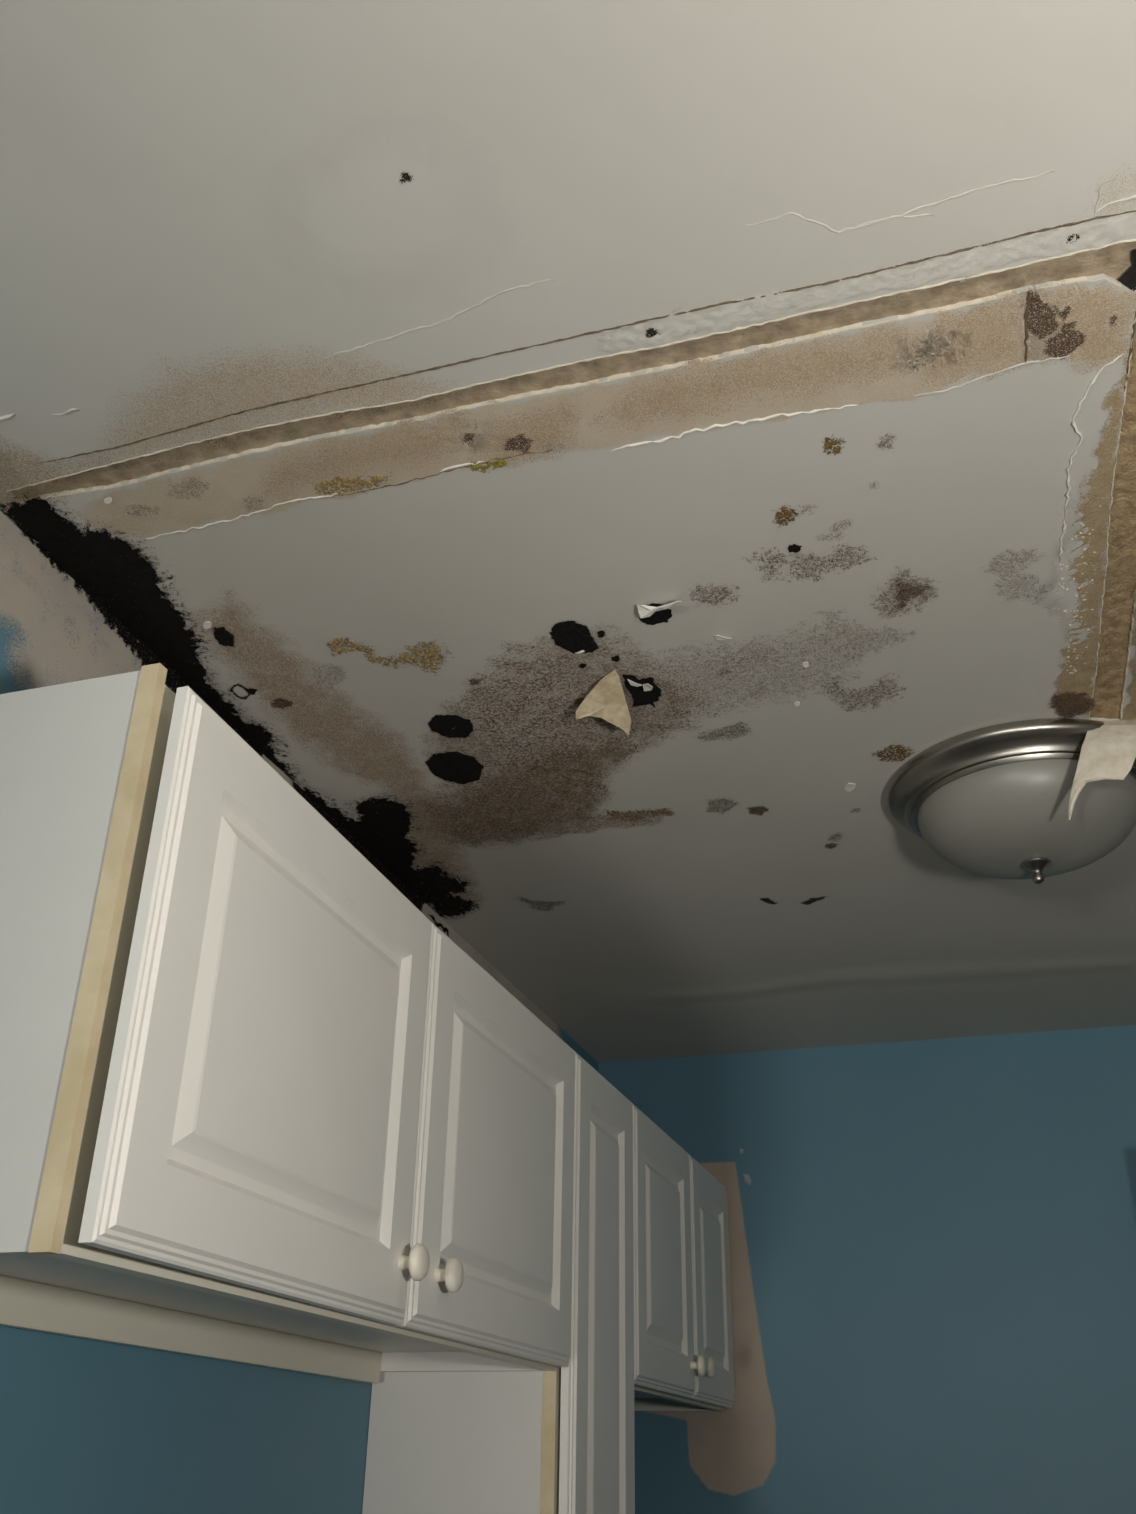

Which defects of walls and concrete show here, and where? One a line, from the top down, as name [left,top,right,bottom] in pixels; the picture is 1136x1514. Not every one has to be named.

crack [746,171,1054,234]
crack [0,413,16,421]
flaking render [0,511,188,693]
damp [0,344,943,937]
crack [34,210,1136,465]
peeling [76,250,1136,720]
spalling [574,669,661,735]
flaking render [260,754,563,1038]
flaking render [644,1149,777,1497]